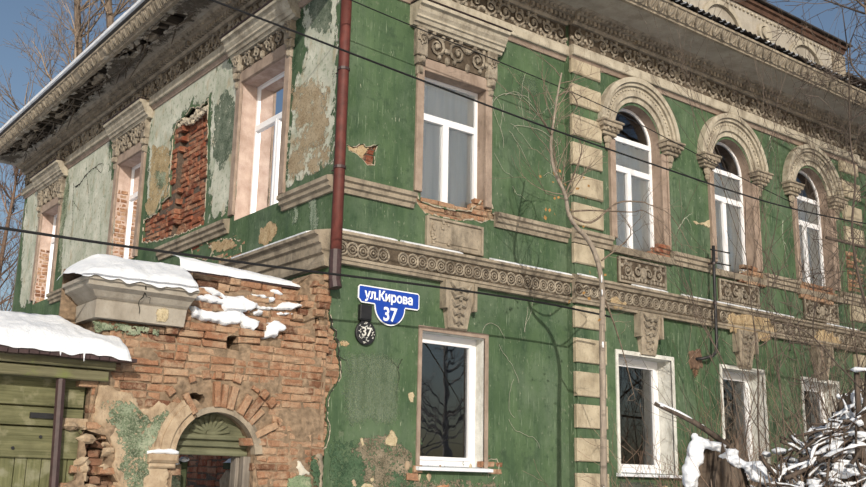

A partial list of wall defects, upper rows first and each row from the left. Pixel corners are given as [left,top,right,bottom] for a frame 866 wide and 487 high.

spalling [0,11,188,156]
flaking render [286,0,341,187]
flaking render [142,59,239,244]
flaking render [347,144,378,166]
flaking render [191,236,245,263]
flaking render [259,221,277,246]
spalling [63,422,115,487]
peeling [351,430,502,487]